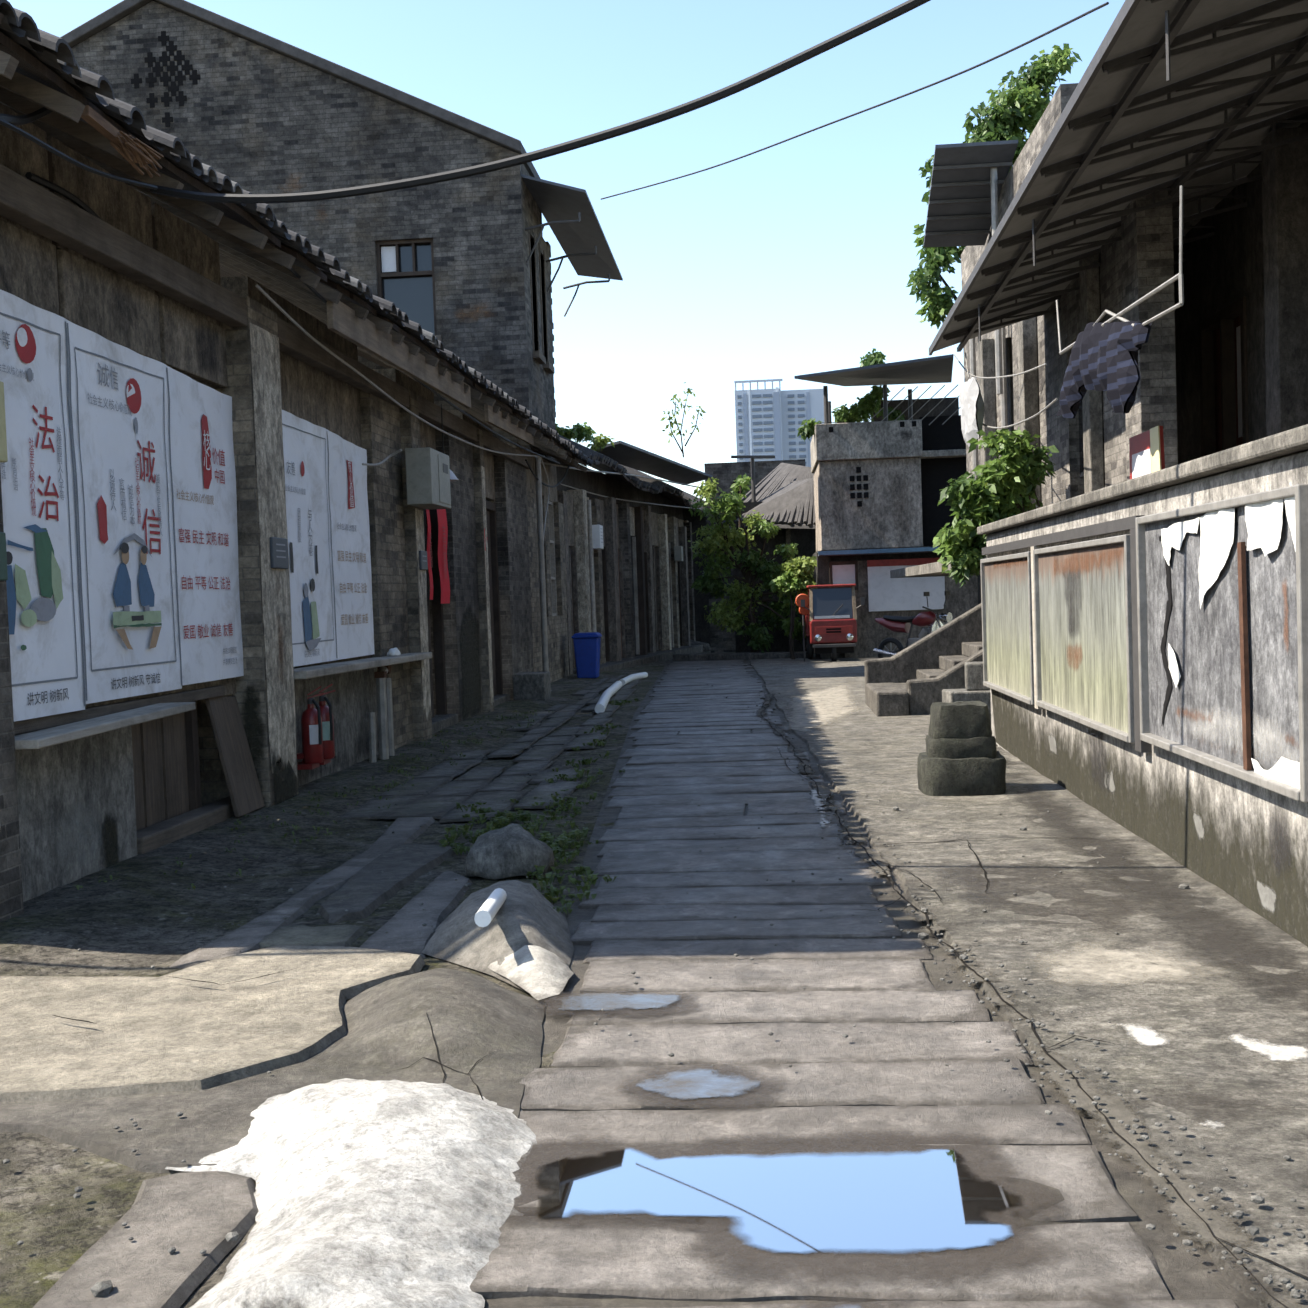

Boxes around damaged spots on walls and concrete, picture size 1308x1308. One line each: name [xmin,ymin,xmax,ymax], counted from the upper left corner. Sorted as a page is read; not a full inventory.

rust [1237,542,1252,770]
water stain [952,689,1308,997]
crack [755,694,1308,1308]